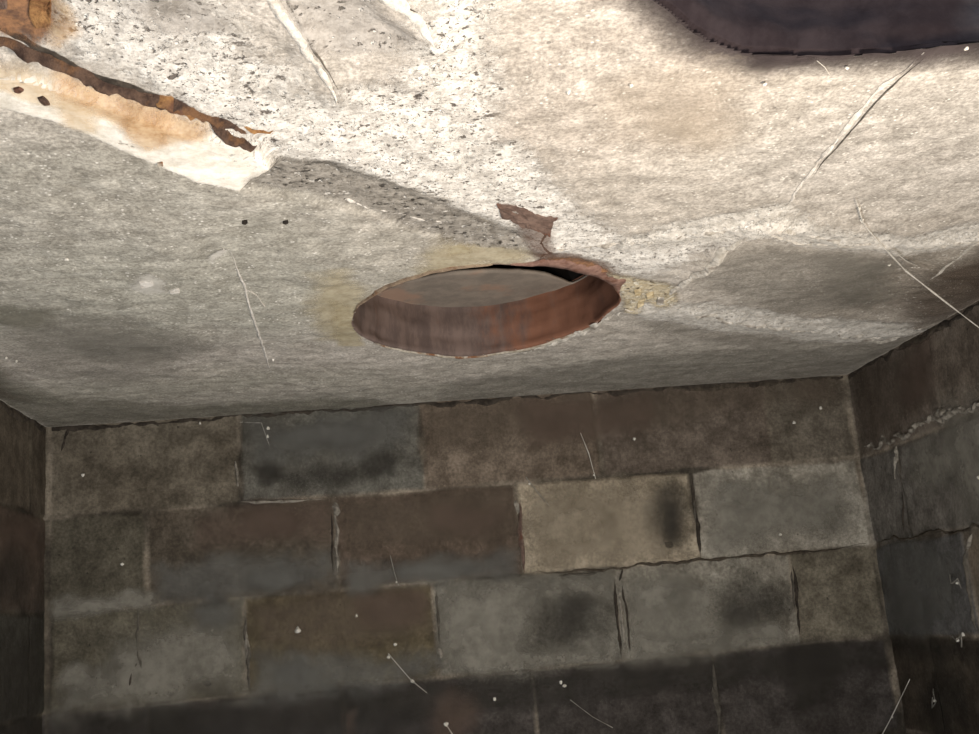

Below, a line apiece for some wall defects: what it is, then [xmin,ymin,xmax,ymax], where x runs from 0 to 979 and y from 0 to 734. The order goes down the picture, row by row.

peeling [133,0,226,35]
peeling [288,0,411,52]
rust [0,0,273,152]
spalling [0,72,525,248]
rust [496,203,626,293]
leakage [318,279,363,346]